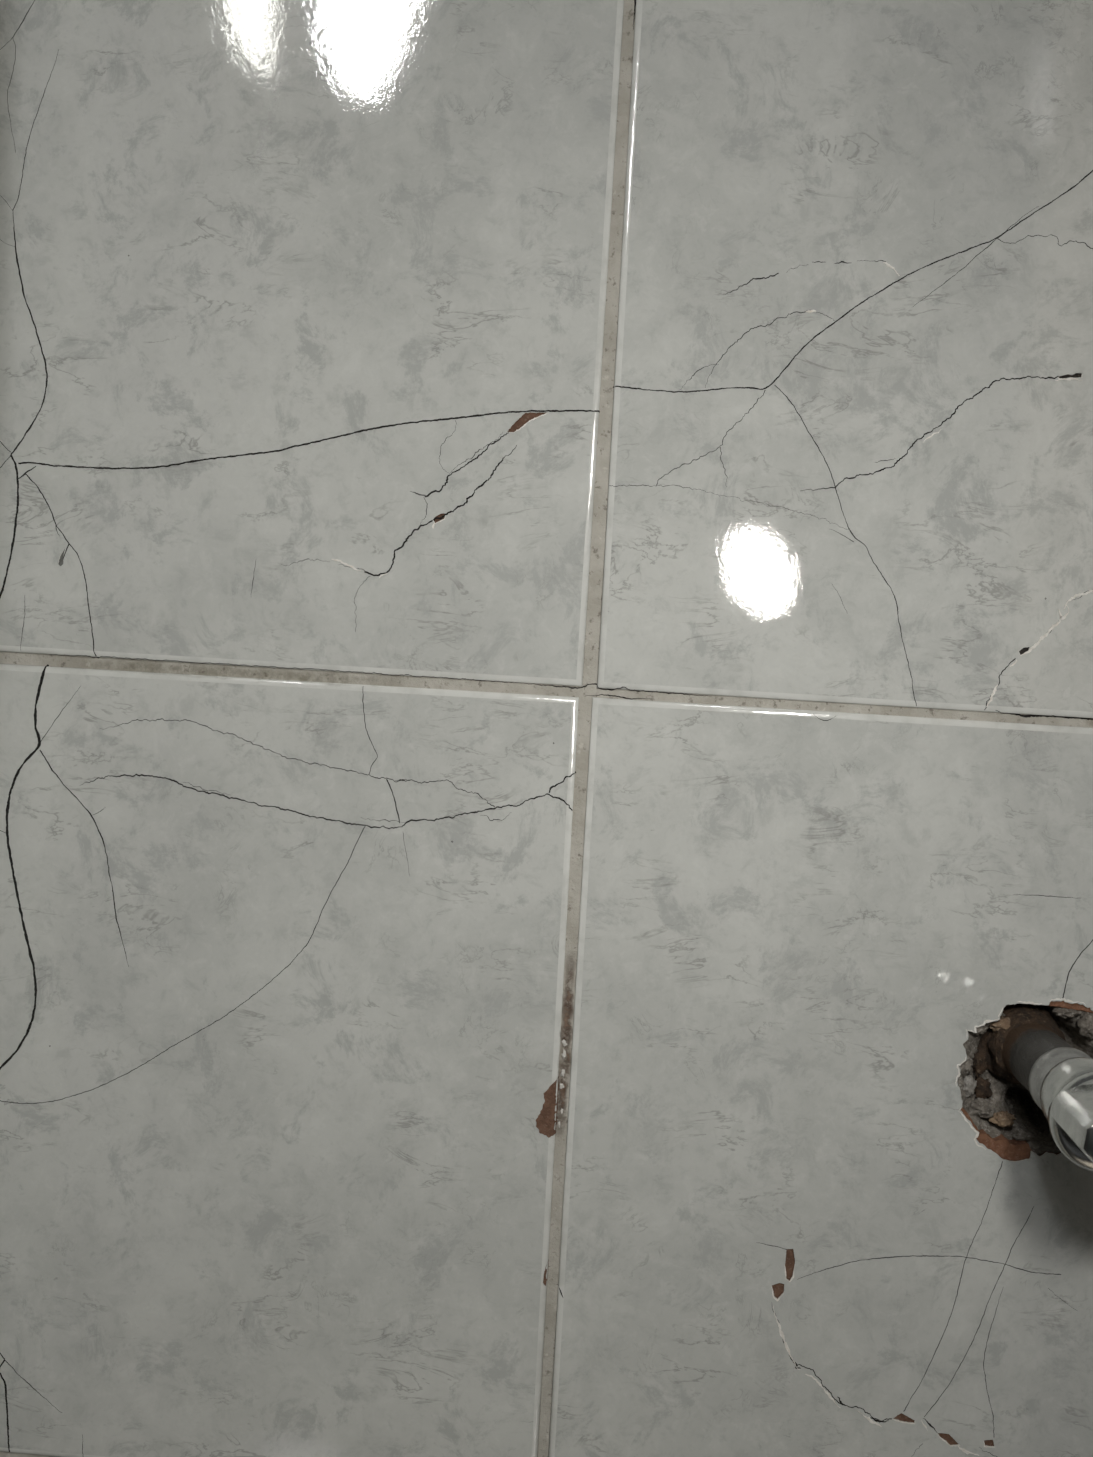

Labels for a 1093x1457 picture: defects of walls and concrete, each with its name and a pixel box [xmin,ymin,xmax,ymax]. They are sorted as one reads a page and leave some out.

crack [0,0,1093,1104]
spalling [536,1076,559,1138]
spalling [955,998,1093,1161]
crack [761,1161,1076,1457]
crack [0,1353,83,1454]